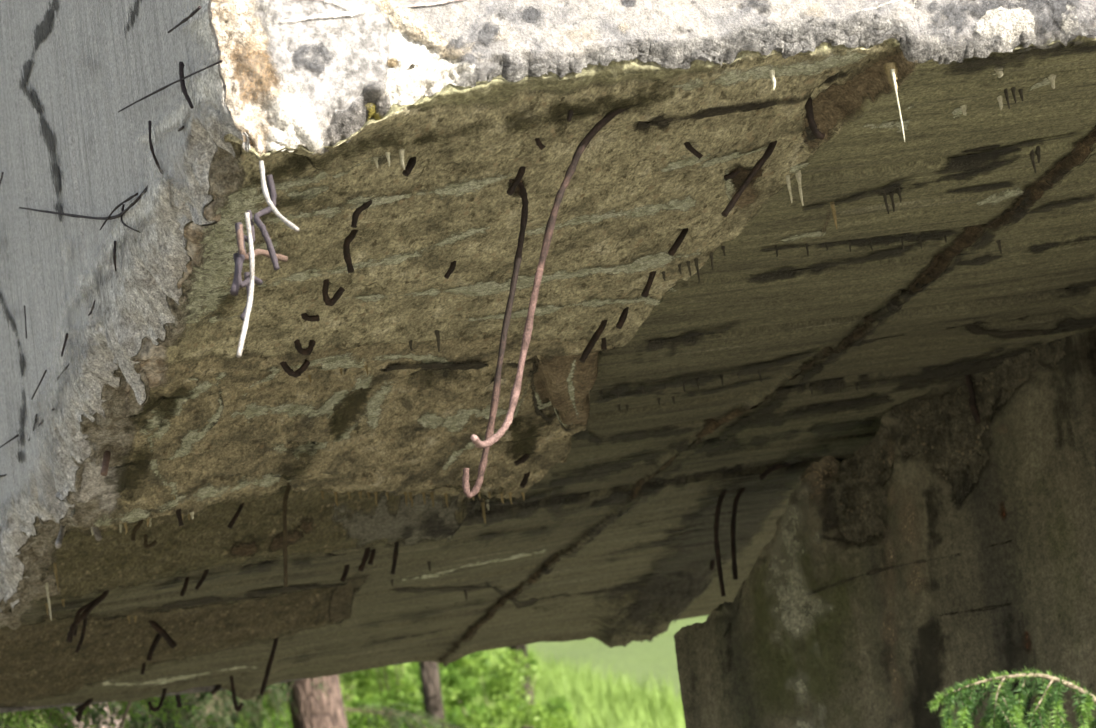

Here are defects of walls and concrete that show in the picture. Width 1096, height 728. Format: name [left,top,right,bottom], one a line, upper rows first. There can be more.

spalling [456,12,1096,88]
crack [635,73,849,131]
crack [962,145,1000,153]
spalling [0,0,916,603]
crack [947,316,1058,371]
spalling [0,146,368,707]
crack [390,579,649,608]
crack [787,553,960,602]
damp [881,610,946,728]